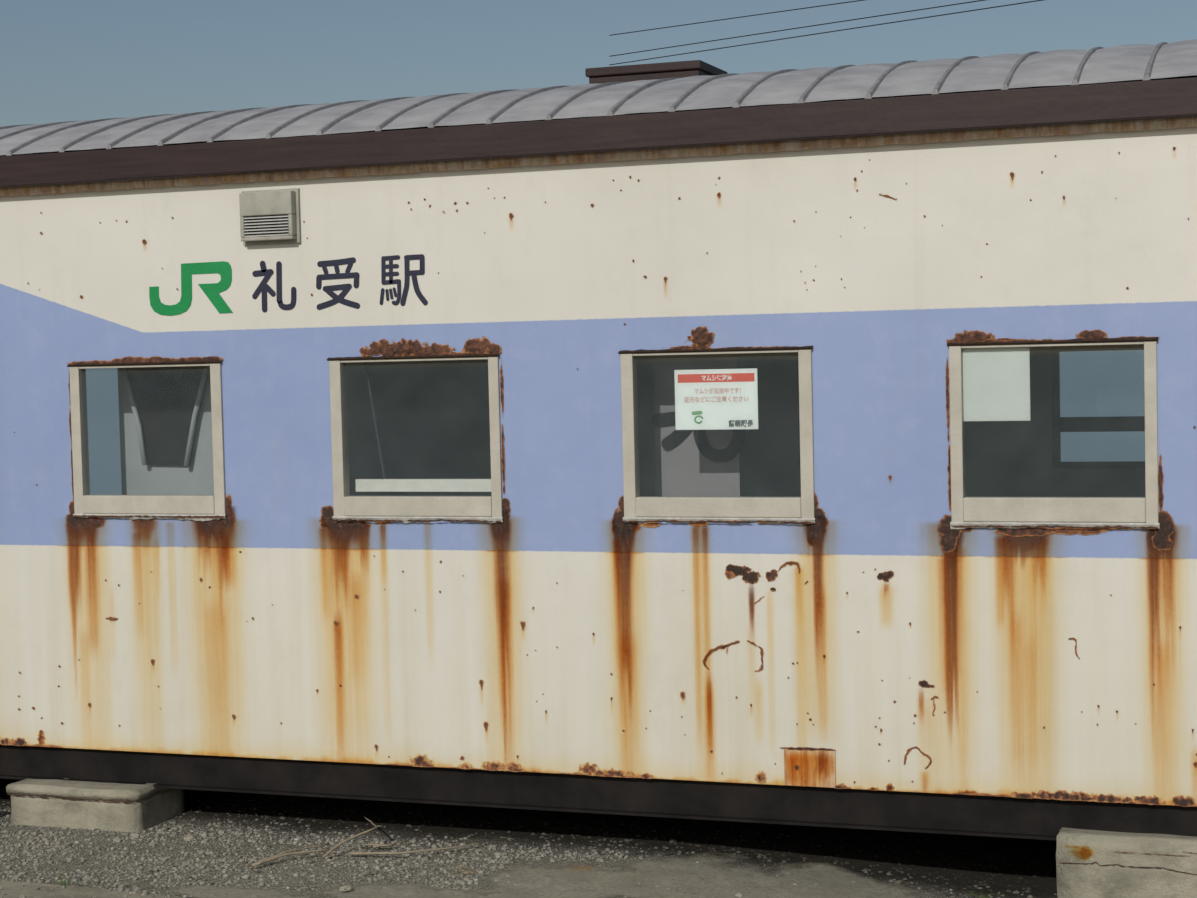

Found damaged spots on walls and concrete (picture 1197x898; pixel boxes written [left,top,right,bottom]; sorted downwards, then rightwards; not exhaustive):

corrosion [946,330,1160,343]
corrosion [198,495,235,546]
corrosion [319,506,392,546]
corrosion [360,337,511,602]
corrosion [612,496,660,605]
corrosion [805,492,828,584]
corrosion [937,360,972,644]
corrosion [995,527,1133,549]
corrosion [1148,455,1175,598]